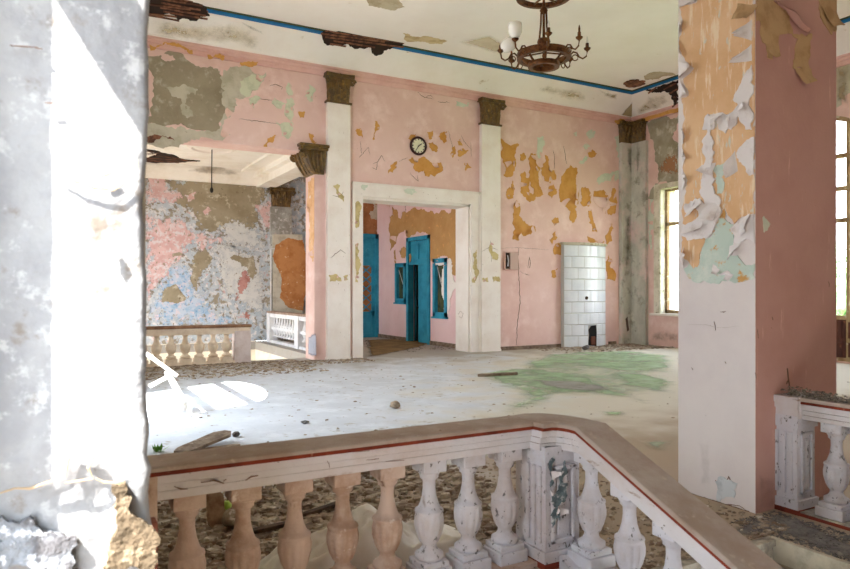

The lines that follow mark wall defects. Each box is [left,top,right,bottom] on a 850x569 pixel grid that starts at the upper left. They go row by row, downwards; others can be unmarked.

spalling [149,0,210,22]
spalling [321,30,446,56]
peeling [818,0,845,35]
spalling [146,42,266,163]
peeling [409,131,471,177]
peeling [501,129,619,244]
peeling [615,0,818,284]
spalling [146,178,271,319]
peeling [387,205,456,314]
crack [515,247,548,344]
spalling [0,515,78,569]
spalling [102,481,160,569]